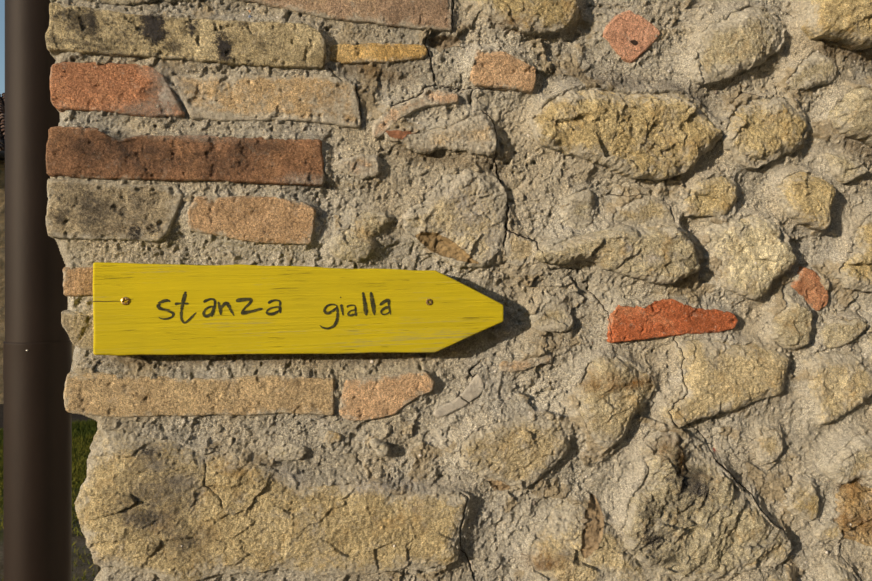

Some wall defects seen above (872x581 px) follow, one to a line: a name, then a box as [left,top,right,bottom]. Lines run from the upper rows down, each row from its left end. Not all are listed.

crack [392,32,505,183]
crack [504,204,612,340]
crack [668,339,786,531]
crack [460,494,475,580]